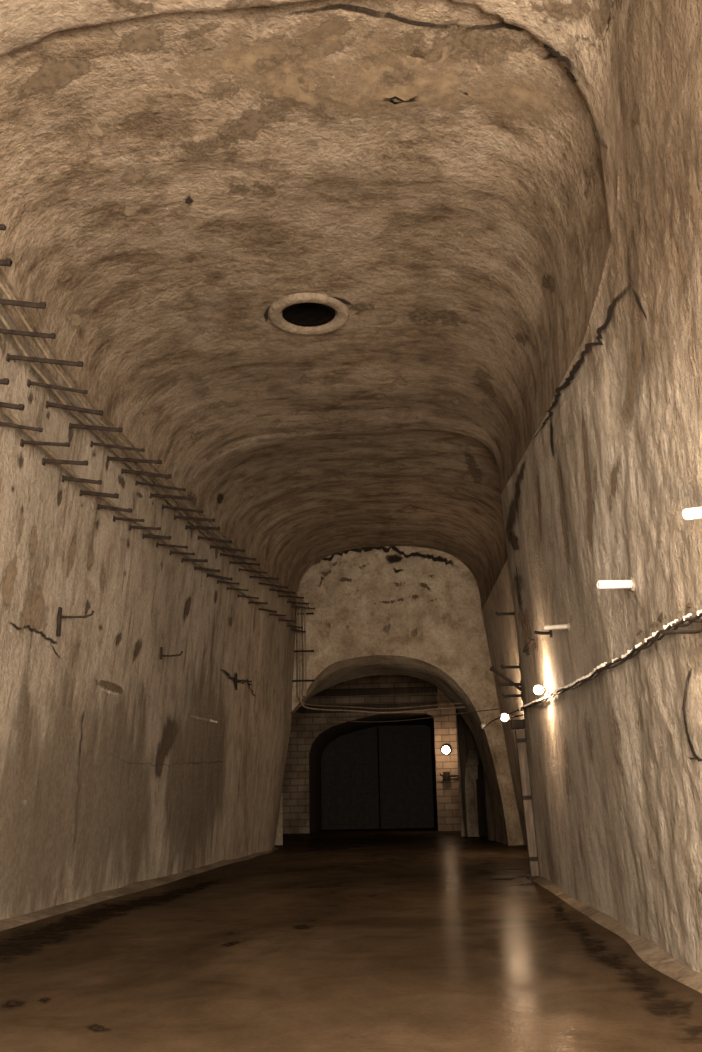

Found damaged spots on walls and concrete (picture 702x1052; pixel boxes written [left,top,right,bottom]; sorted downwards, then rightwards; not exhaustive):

crack [295,4,577,82]
crack [533,260,647,456]
crack [315,546,453,565]
damp [0,669,226,963]